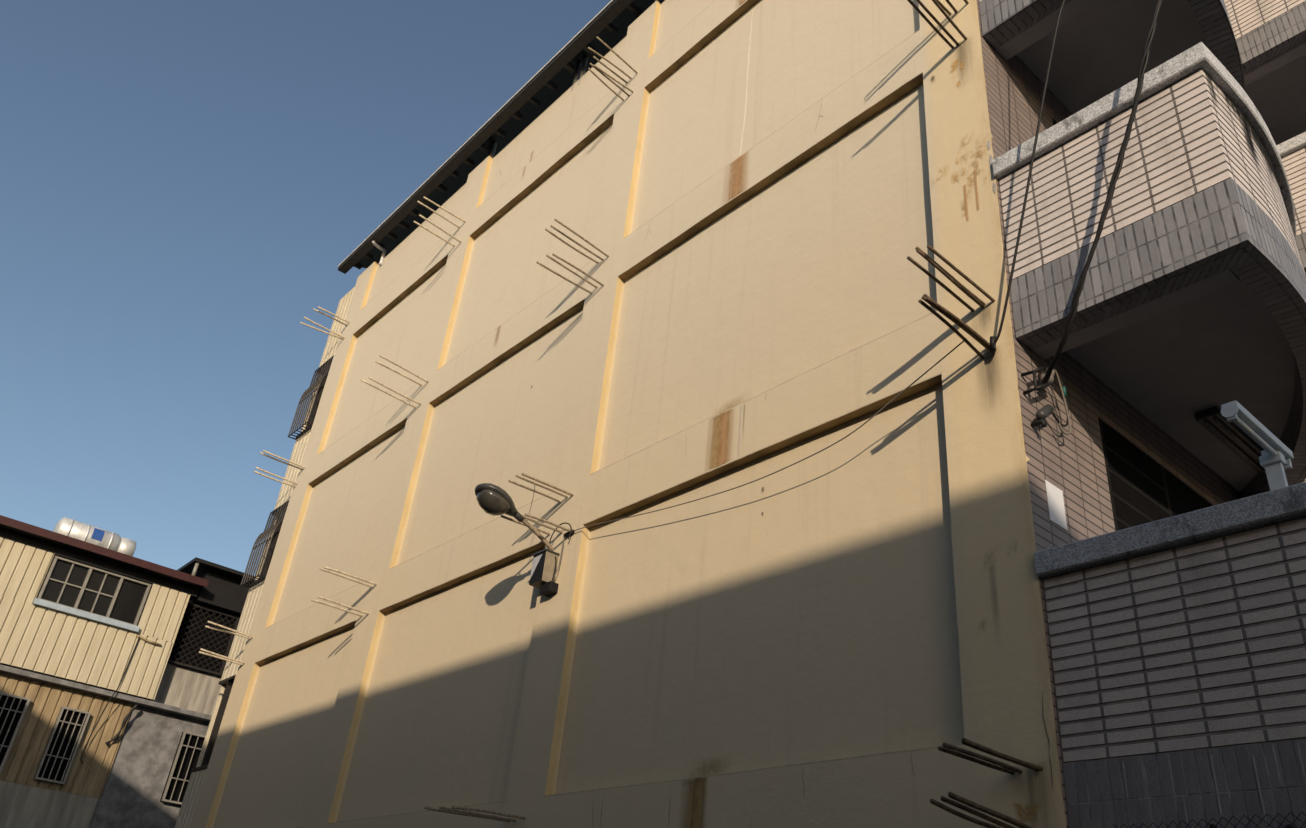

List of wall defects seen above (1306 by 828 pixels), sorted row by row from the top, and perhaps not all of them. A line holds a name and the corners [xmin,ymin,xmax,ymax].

rust [728,155,744,201]
rust [954,144,982,221]
rust [710,411,729,469]
rust [685,778,704,828]